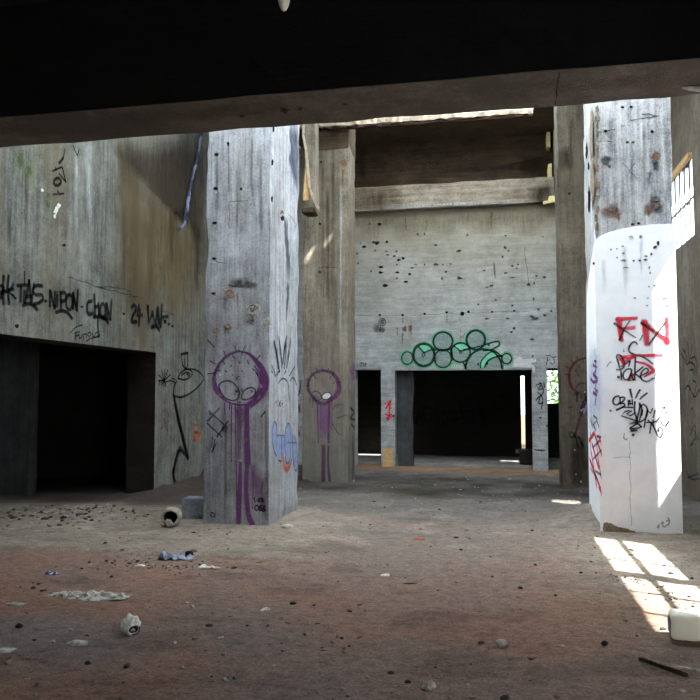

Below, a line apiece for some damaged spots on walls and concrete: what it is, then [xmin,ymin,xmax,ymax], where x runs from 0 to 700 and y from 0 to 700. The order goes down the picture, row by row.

corrosion [648,152,660,183]
damp [128,144,197,280]
corrosion [604,205,620,220]
corrosion [645,196,662,215]
spalling [222,280,271,327]
peeling [603,522,636,533]